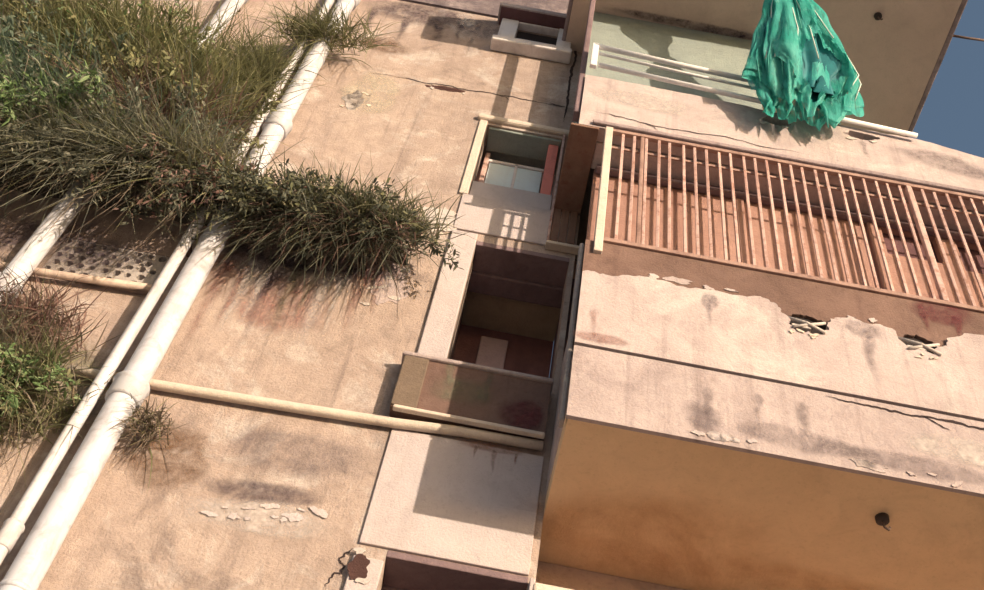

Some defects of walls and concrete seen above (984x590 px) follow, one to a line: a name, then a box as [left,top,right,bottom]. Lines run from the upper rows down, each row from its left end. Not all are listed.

crack [385,51,577,118]
crack [605,113,804,154]
damp [224,243,371,326]
flaking render [648,273,739,293]
spalling [788,316,827,339]
spalling [898,336,943,360]
crack [829,396,984,431]
peeling [200,502,328,536]
spalling [347,547,370,585]